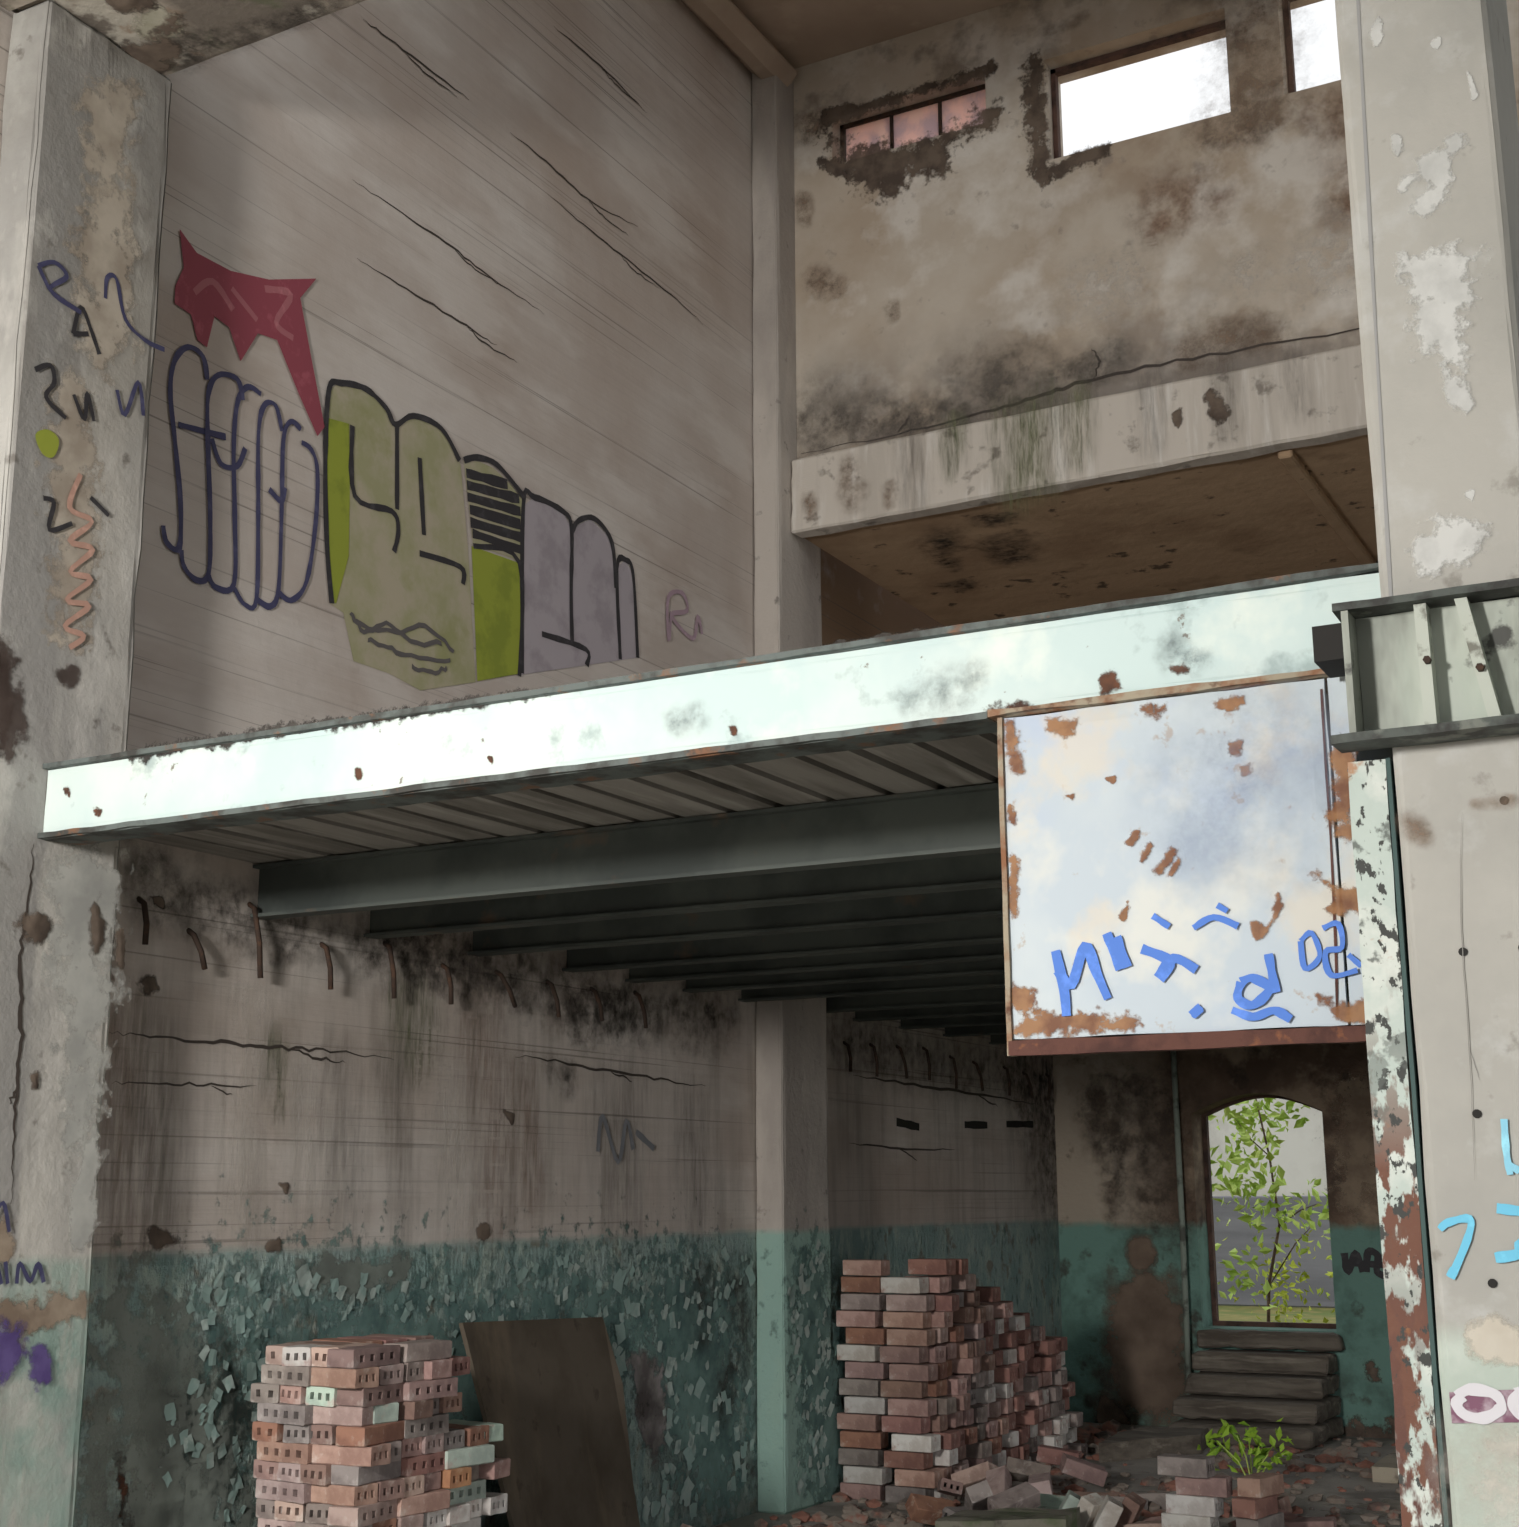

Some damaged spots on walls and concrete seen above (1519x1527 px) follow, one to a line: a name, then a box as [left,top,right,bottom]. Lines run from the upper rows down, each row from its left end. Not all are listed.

peeling [1397,133,1466,218]
peeling [35,0,184,654]
peeling [1396,241,1477,413]
leakage [981,353,1039,496]
crack [801,328,1359,454]
corrosion [1098,671,1121,696]
corrosion [1125,830,1180,876]
corrosion [1250,892,1283,940]
corrosion [1310,872,1359,916]
peeling [13,843,165,1250]
corrosion [1011,982,1144,1038]
peeling [0,1201,758,1527]